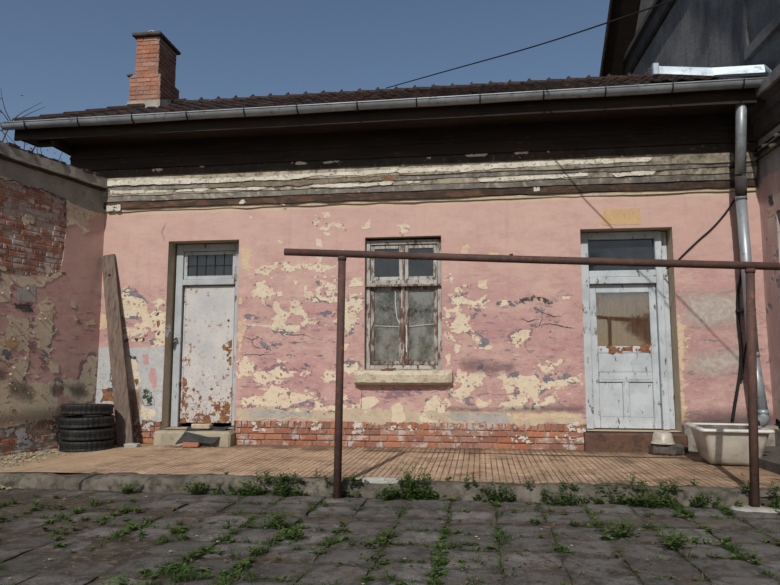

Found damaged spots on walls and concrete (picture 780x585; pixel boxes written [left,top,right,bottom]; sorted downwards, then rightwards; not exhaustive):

peeling [107,151,655,204]
flaking render [0,180,121,450]
flaking render [119,286,171,443]
peeling [235,212,586,444]
peeling [758,170,780,424]